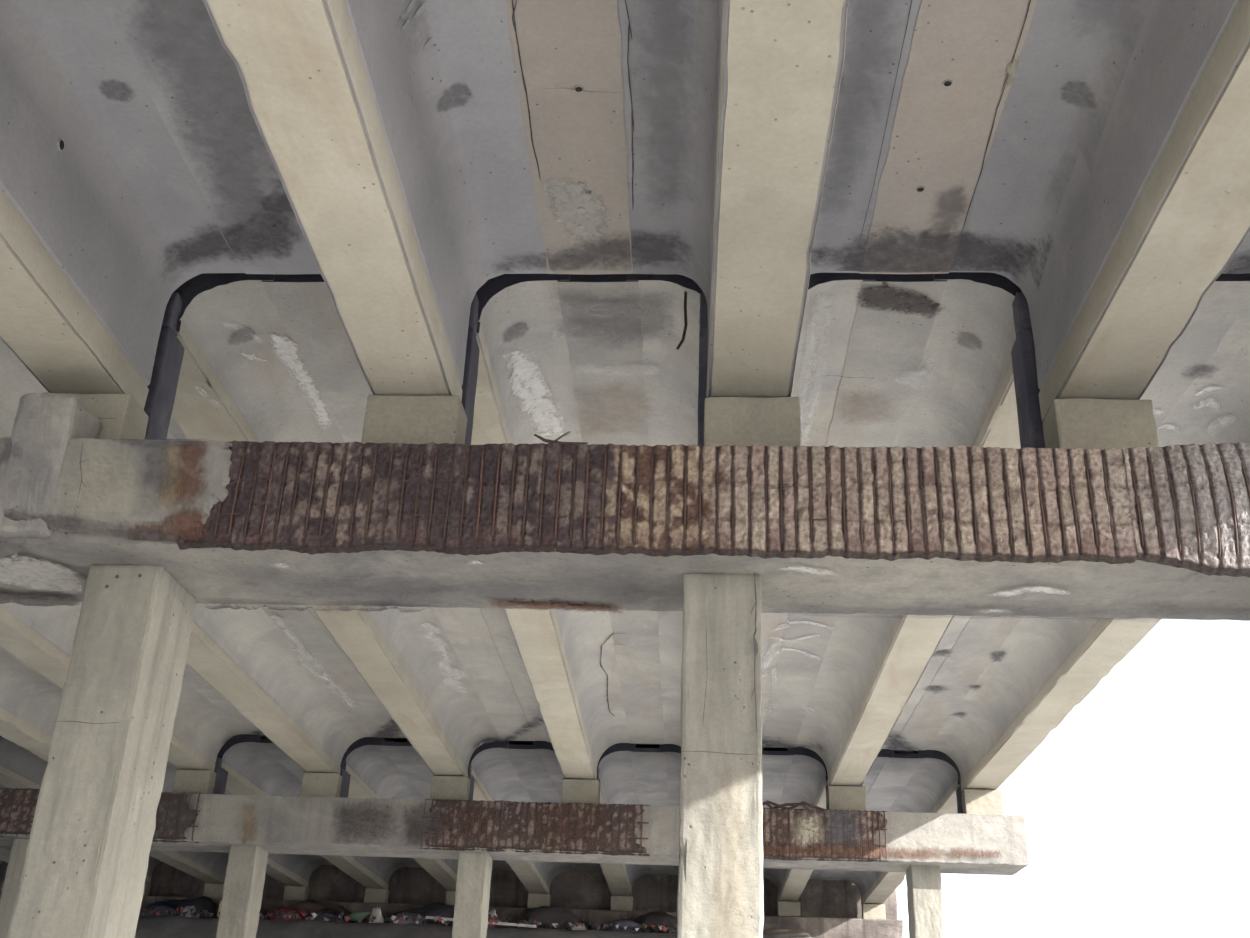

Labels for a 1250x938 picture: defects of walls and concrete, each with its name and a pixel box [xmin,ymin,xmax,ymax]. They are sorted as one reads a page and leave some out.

damp [169,193,295,264]
damp [842,231,1035,273]
damp [1225,255,1250,274]
damp [228,323,330,428]
damp [508,351,566,436]
rust [130,441,206,543]
spalling [4,440,1137,564]
crack [600,633,626,716]
spalling [0,788,40,837]
spalling [148,762,207,843]
spalling [336,799,651,856]
spalling [763,808,888,862]